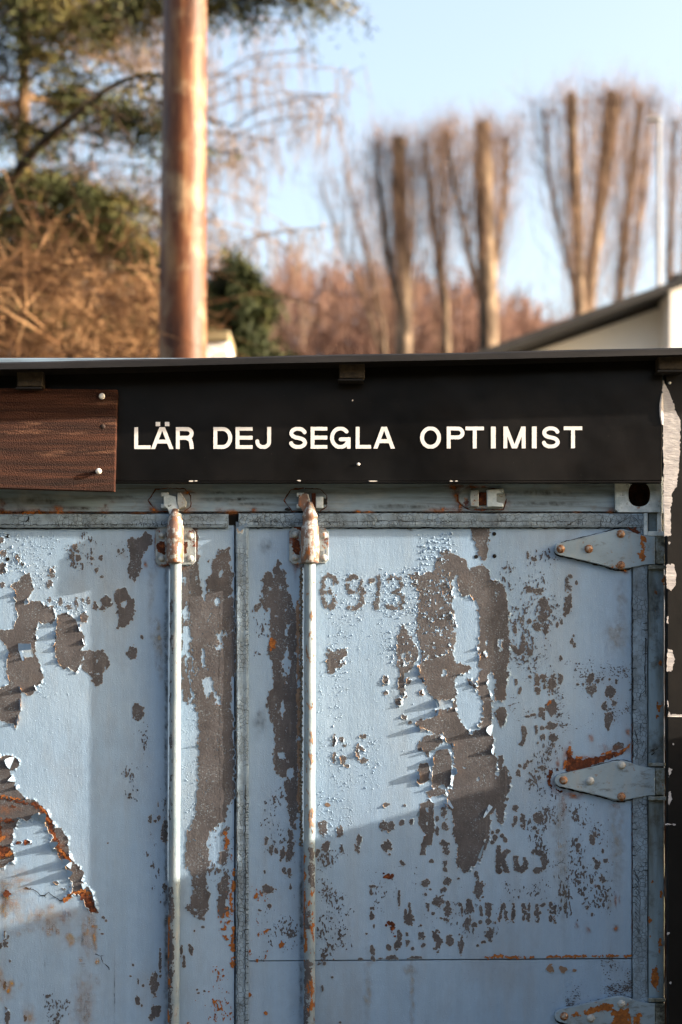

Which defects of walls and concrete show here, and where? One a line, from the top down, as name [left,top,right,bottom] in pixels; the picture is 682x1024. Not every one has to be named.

peeling [0,530,154,730]
rust [156,541,168,567]
rust [292,527,301,568]
rust [0,794,73,863]
peeling [0,752,108,935]
peeling [129,528,236,1024]
peeling [249,559,363,1024]
peeling [357,527,633,962]
rust [547,730,631,810]
rust [571,1002,642,1024]